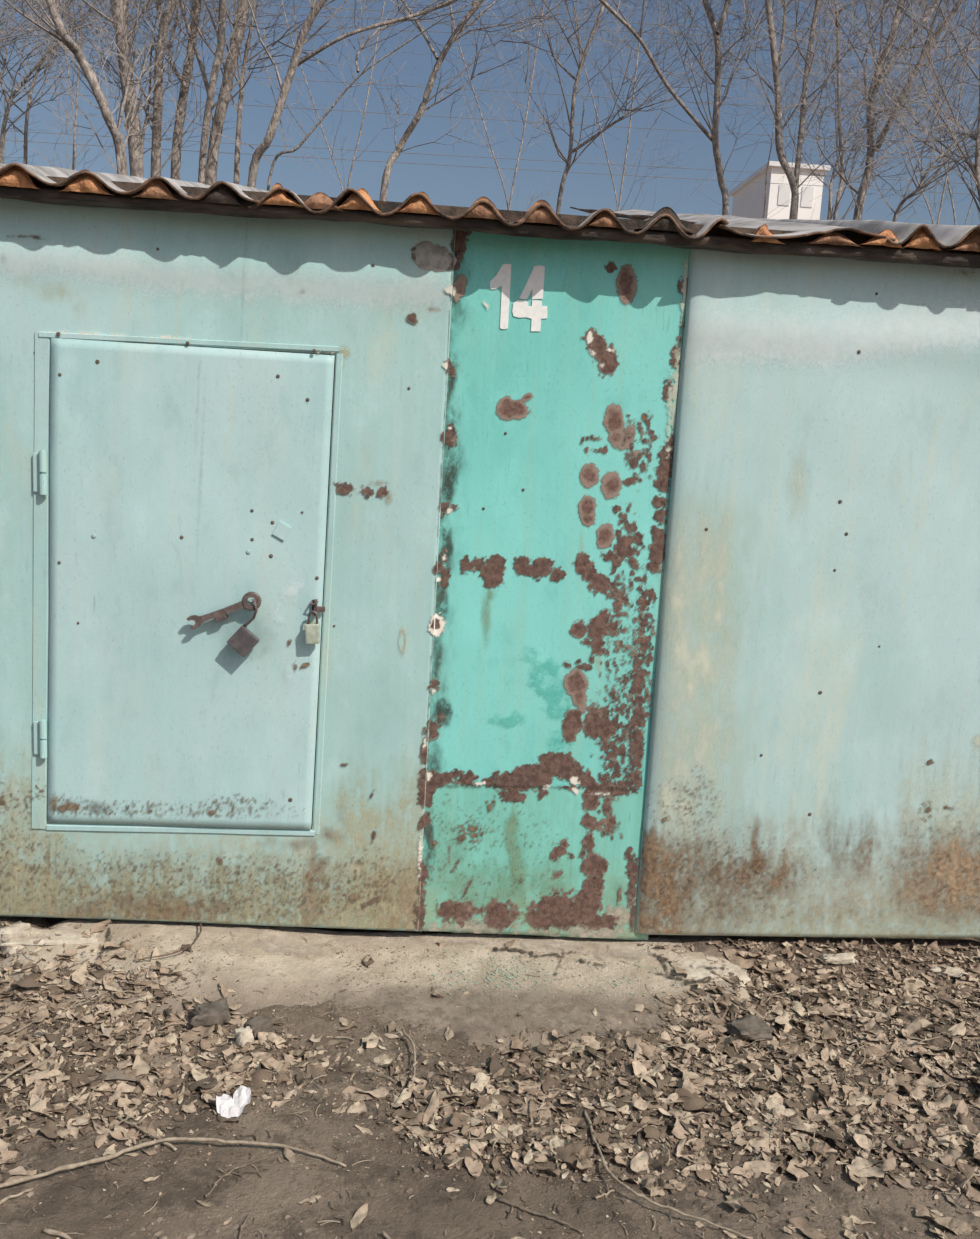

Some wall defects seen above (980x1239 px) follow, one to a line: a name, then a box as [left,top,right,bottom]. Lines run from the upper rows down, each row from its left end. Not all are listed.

peeling [414,258,779,960]
corrosion [375,869,421,929]
corrosion [639,829,793,934]
corrosion [881,831,980,916]